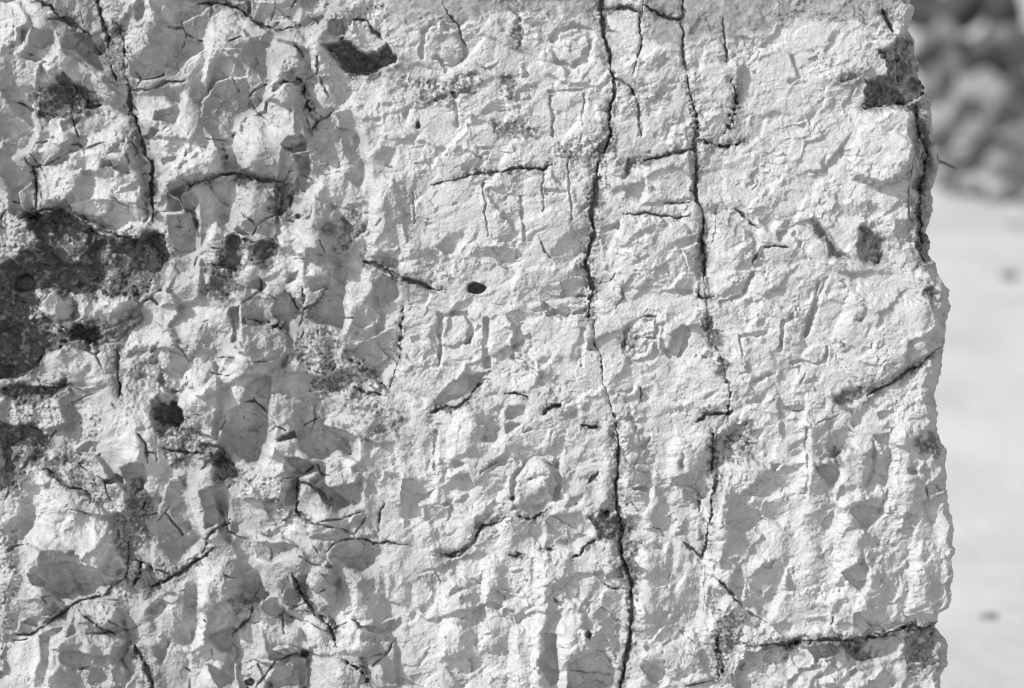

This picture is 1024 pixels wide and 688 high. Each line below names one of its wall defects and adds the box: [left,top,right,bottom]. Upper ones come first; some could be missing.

crack [879,8,893,32]
crack [25,0,288,241]
crack [438,162,556,184]
crack [860,59,929,267]
crack [686,381,754,616]
crack [714,634,724,684]
crack [761,620,935,648]